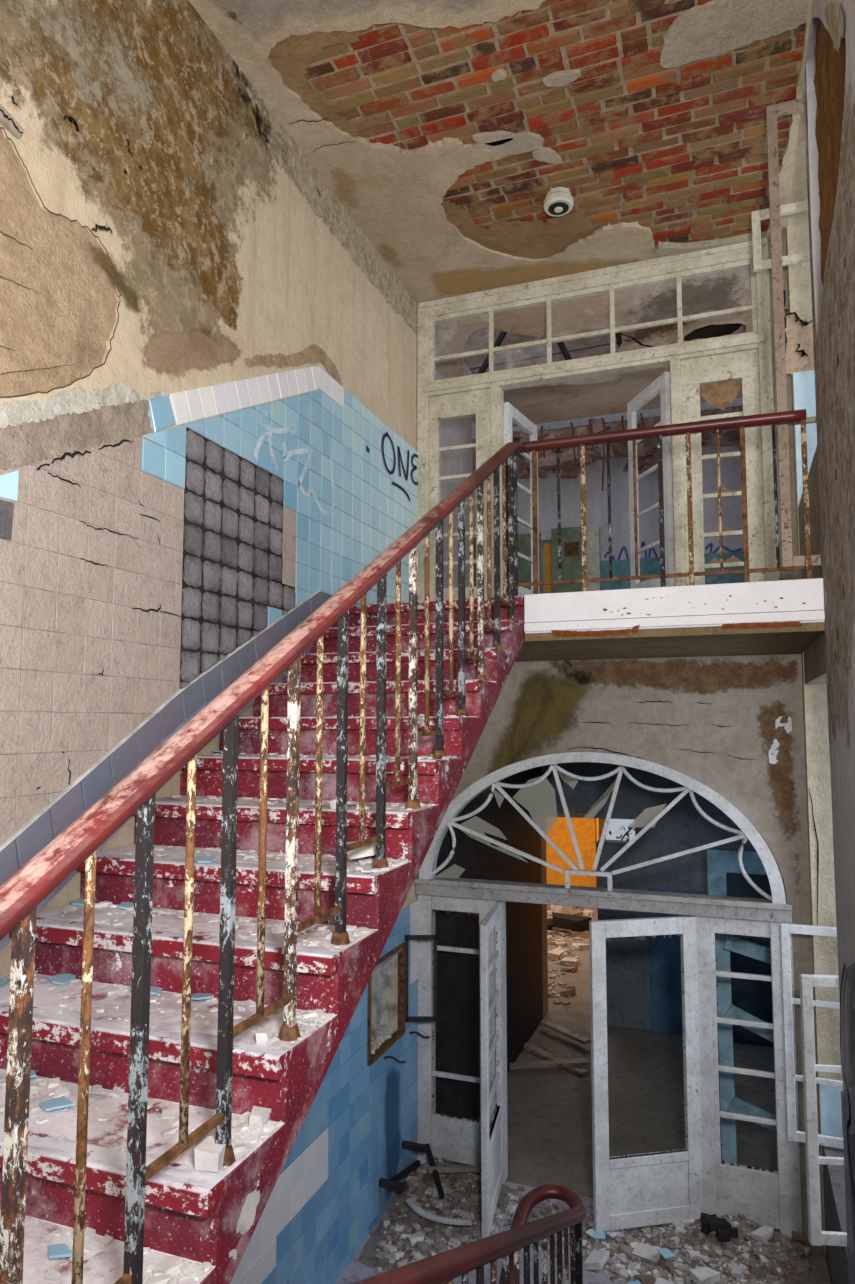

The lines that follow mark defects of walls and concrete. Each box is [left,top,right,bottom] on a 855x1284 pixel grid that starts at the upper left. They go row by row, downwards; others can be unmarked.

water stain [0,0,289,341]
spalling [0,104,121,398]
spalling [268,0,855,755]
crack [36,439,133,488]
crack [80,501,160,543]
flaking render [0,399,296,846]
crack [132,604,182,617]
water stain [488,658,797,791]
water stain [758,702,799,839]
peeling [768,716,792,764]